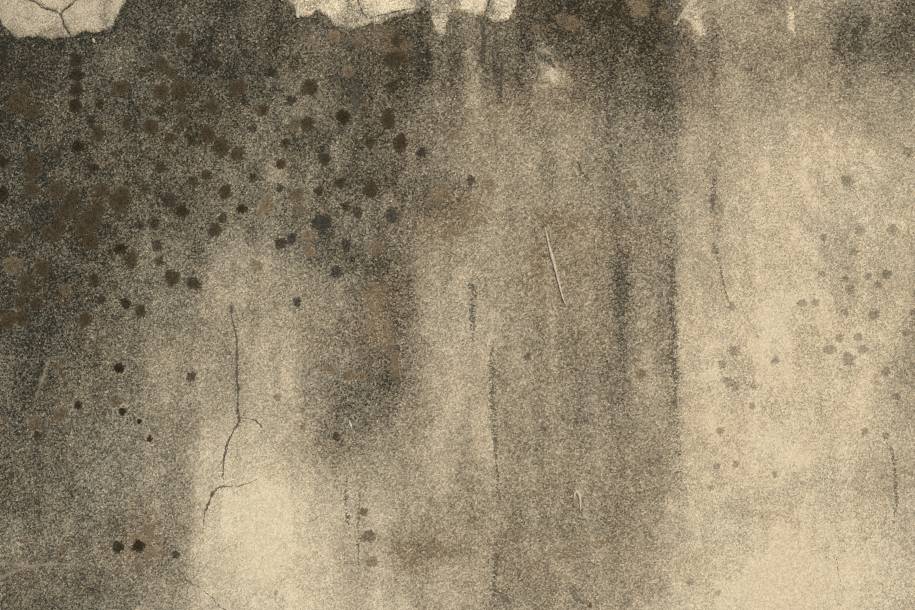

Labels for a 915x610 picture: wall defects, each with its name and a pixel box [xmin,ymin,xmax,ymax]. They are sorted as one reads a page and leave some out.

peeling [0,0,126,43]
peeling [284,0,517,37]
water stain [53,51,246,163]
water stain [285,78,318,106]
water stain [4,150,149,251]
water stain [314,28,436,295]
water stain [133,217,202,290]
water stain [120,297,146,318]
crack [202,309,262,530]
water stain [430,284,497,466]
water stain [112,539,146,554]
water stain [202,405,364,610]